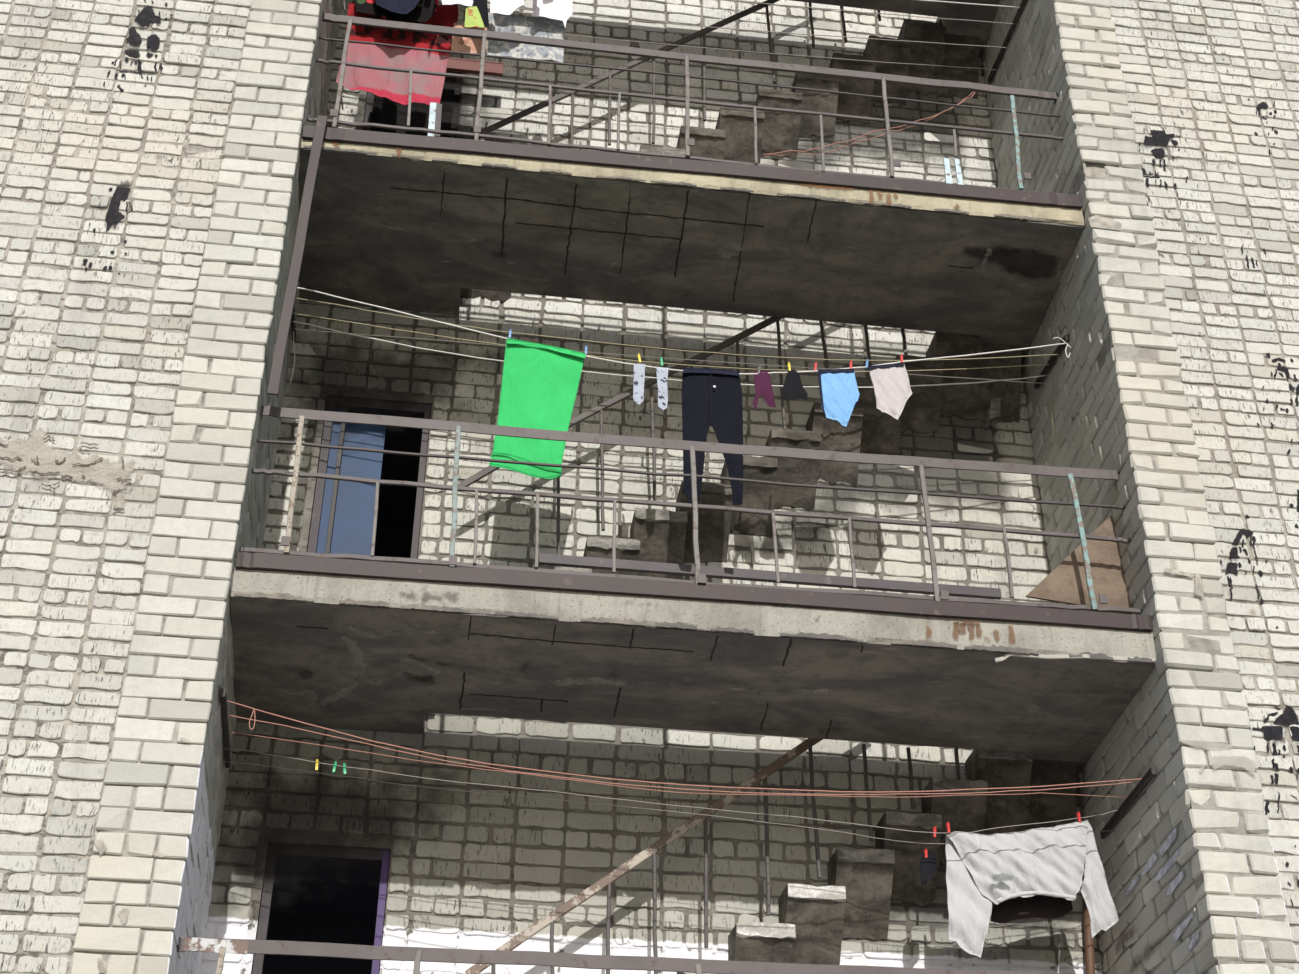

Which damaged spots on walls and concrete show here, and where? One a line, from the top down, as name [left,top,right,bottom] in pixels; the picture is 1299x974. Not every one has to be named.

damp [967,248,1056,278]
spalling [0,430,135,511]
corrosion [953,620,1015,643]